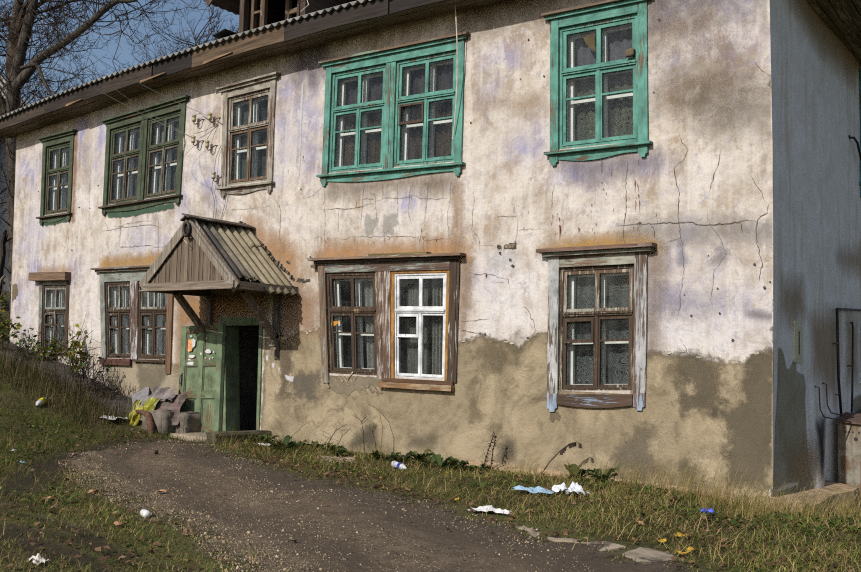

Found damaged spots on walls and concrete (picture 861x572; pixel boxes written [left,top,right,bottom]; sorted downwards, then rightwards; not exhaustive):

water stain [317,242,461,258]
crack [618,135,768,316]
peeling [261,326,815,497]
water stain [675,353,772,488]